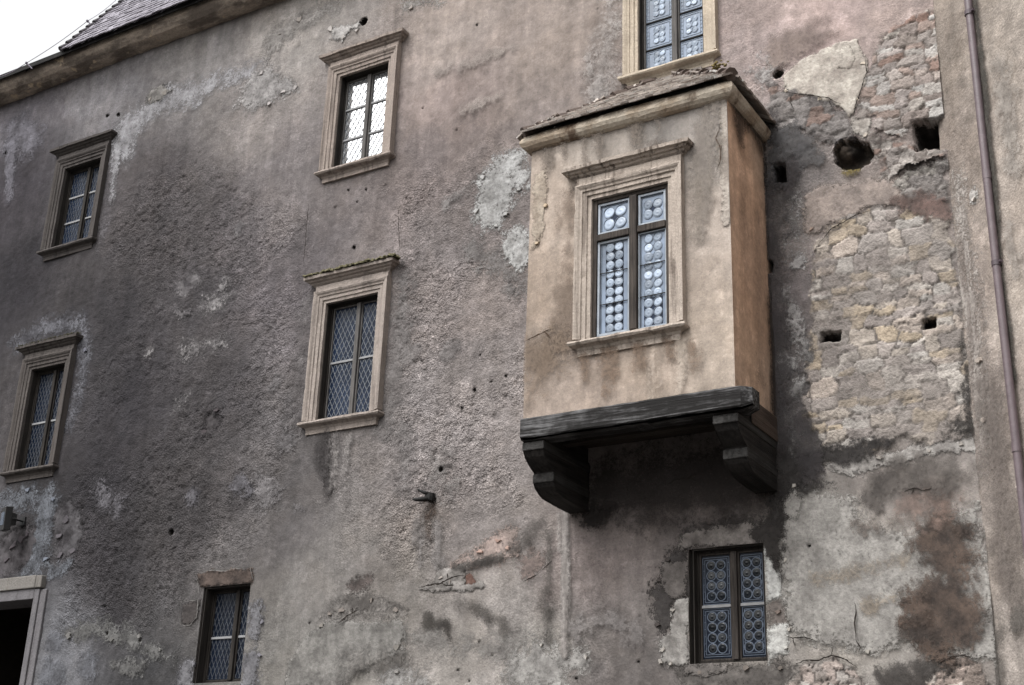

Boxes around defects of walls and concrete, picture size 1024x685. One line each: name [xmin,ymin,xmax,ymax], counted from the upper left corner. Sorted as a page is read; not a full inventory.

water stain [109,59,267,205]
peeling [469,148,548,272]
flaking render [763,7,1002,484]
water stain [745,0,1024,685]
peeling [0,480,85,581]
water stain [311,429,353,501]
spalling [418,522,520,594]
peeling [646,482,997,685]